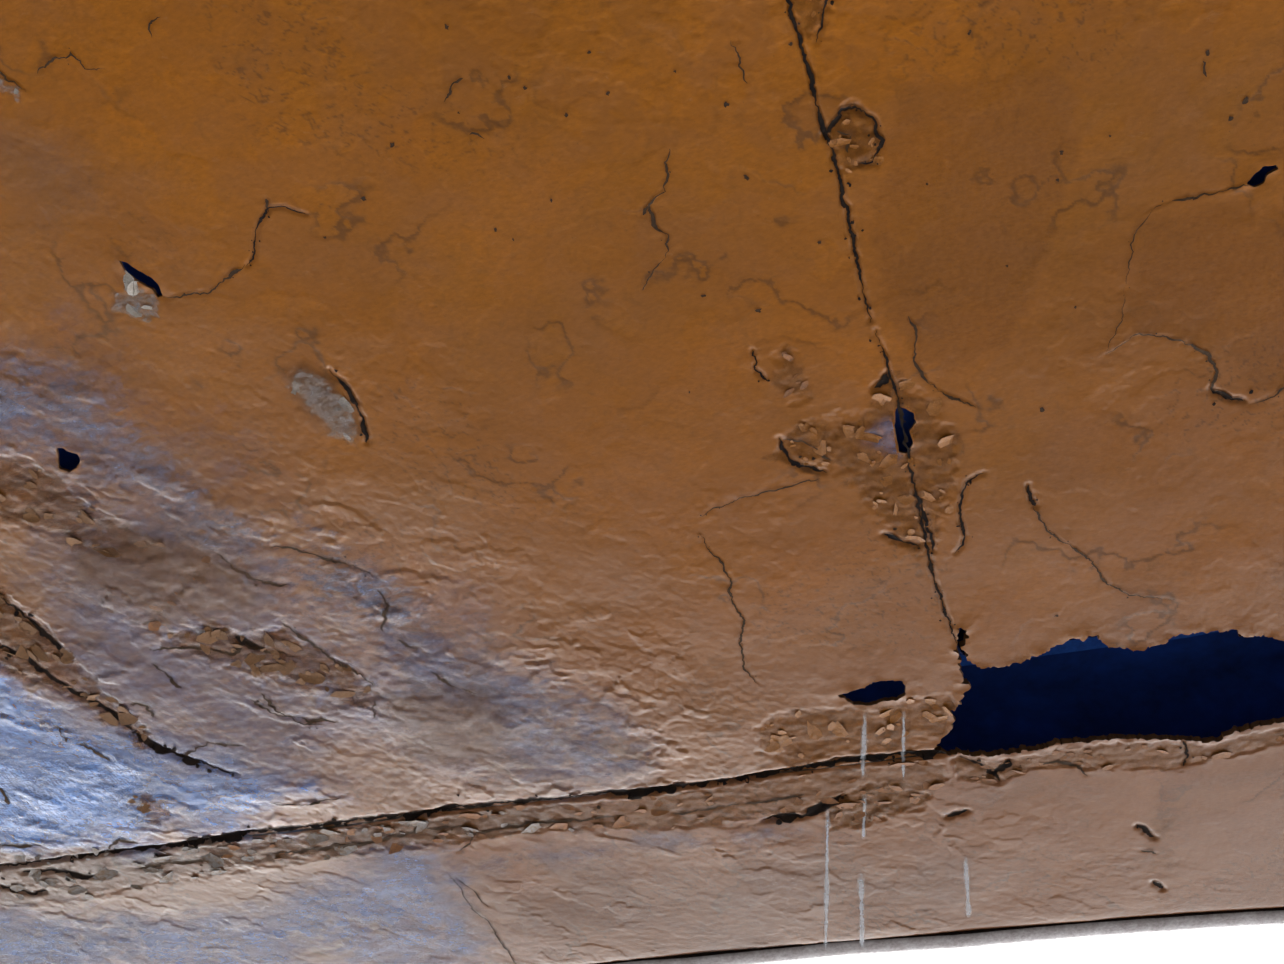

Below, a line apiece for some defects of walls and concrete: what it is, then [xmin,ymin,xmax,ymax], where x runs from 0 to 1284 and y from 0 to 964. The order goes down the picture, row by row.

peeling [827,104,884,173]
peeling [0,448,166,563]
peeling [291,373,357,442]
crack [698,437,830,685]
peeling [778,379,962,554]
crack [784,0,982,647]
crack [1106,184,1284,406]
crack [0,598,242,777]
crack [149,623,376,718]
crack [249,688,340,729]
spalling [761,628,1284,823]
crack [0,750,1087,964]